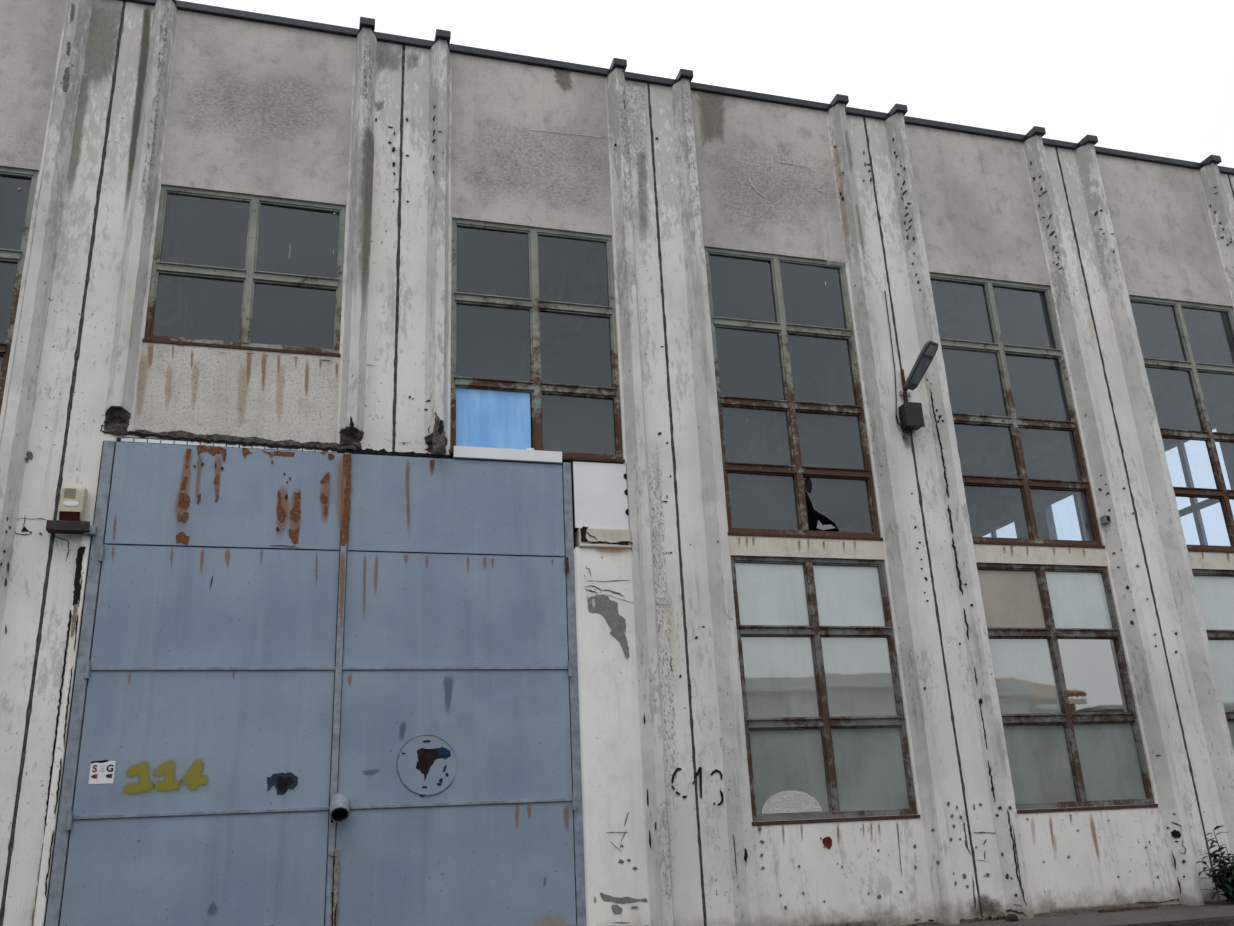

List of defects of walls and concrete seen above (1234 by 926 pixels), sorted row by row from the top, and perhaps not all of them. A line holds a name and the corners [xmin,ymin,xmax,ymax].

water stain [700,96,723,138]
water stain [360,131,374,283]
rust [247,355,280,382]
rust [242,448,295,464]
spalling [123,396,450,459]
rust [171,445,227,562]
rust [261,473,301,560]
rust [320,452,352,610]
peeling [587,594,629,659]
peeling [267,772,298,795]
peeling [419,740,451,797]